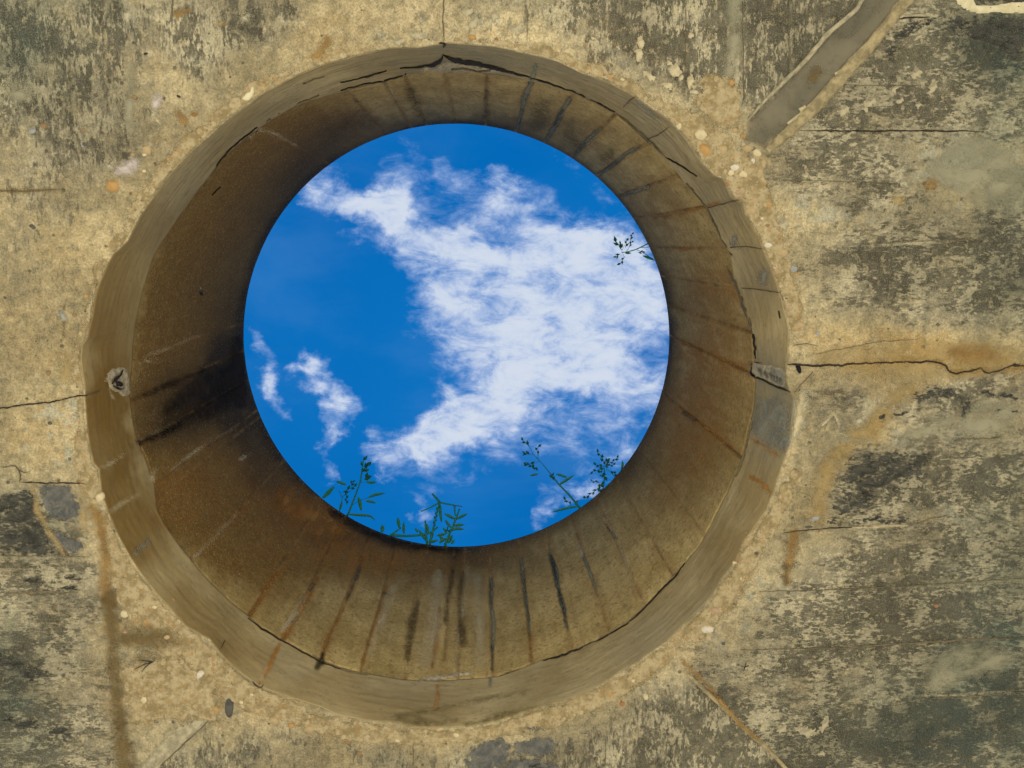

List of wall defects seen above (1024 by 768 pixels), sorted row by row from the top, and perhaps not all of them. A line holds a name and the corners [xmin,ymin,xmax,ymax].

crack [212,0,1024,477]
crack [0,391,99,409]
leakage [138,338,247,444]
leakage [406,608,417,654]